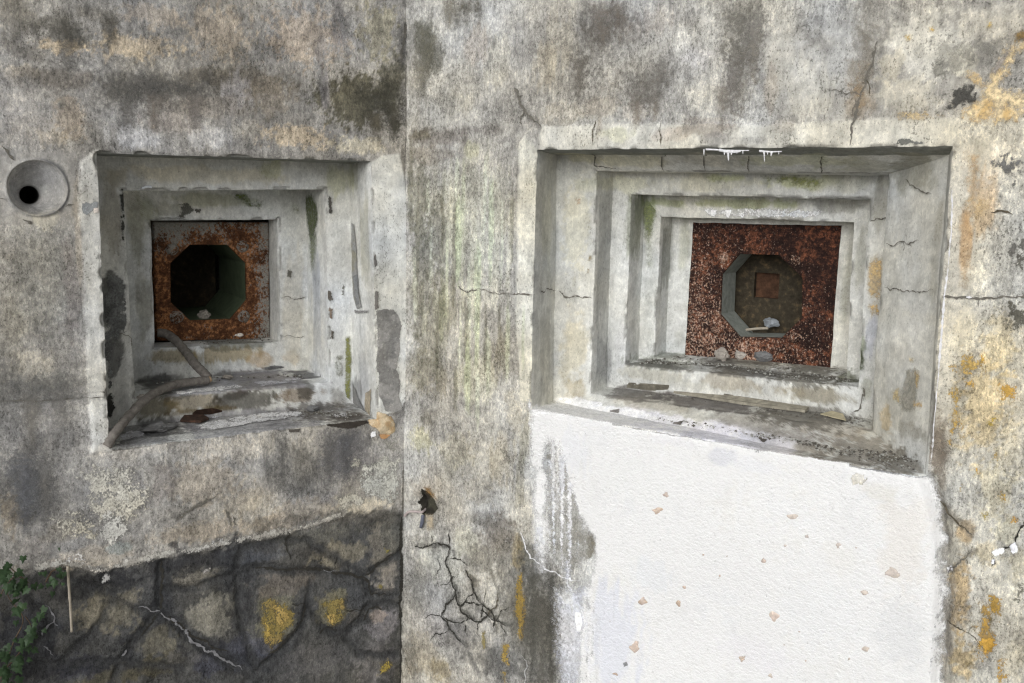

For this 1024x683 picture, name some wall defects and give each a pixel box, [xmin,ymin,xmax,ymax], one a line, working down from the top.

crack [399,22,407,160]
crack [828,42,877,144]
spalling [962,31,1024,123]
crack [458,286,591,298]
crack [885,179,1024,573]
crack [122,466,510,683]